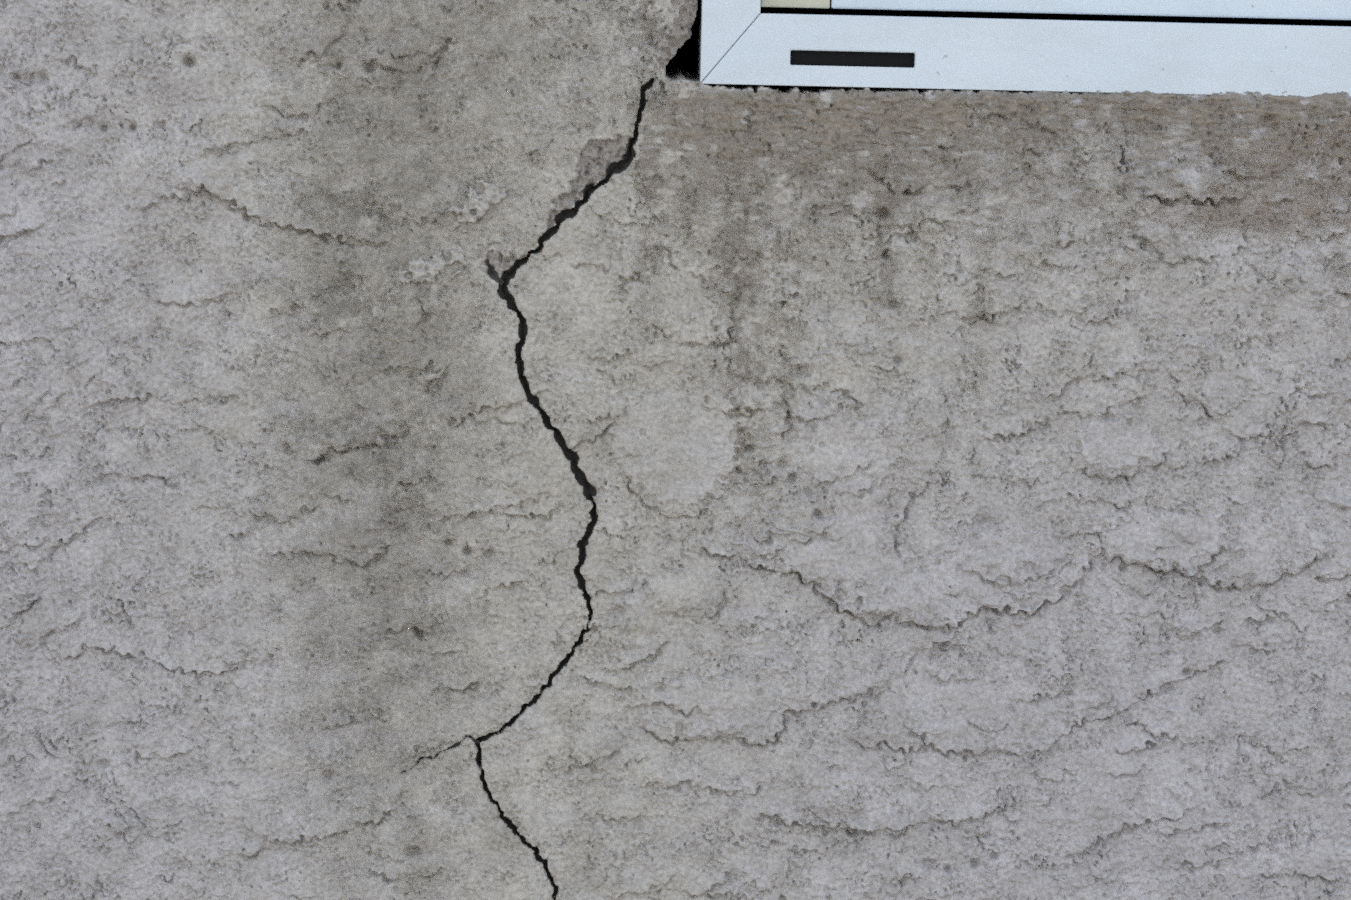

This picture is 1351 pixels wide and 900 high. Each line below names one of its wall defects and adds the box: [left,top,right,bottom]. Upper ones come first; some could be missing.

crack [402,78,654,900]